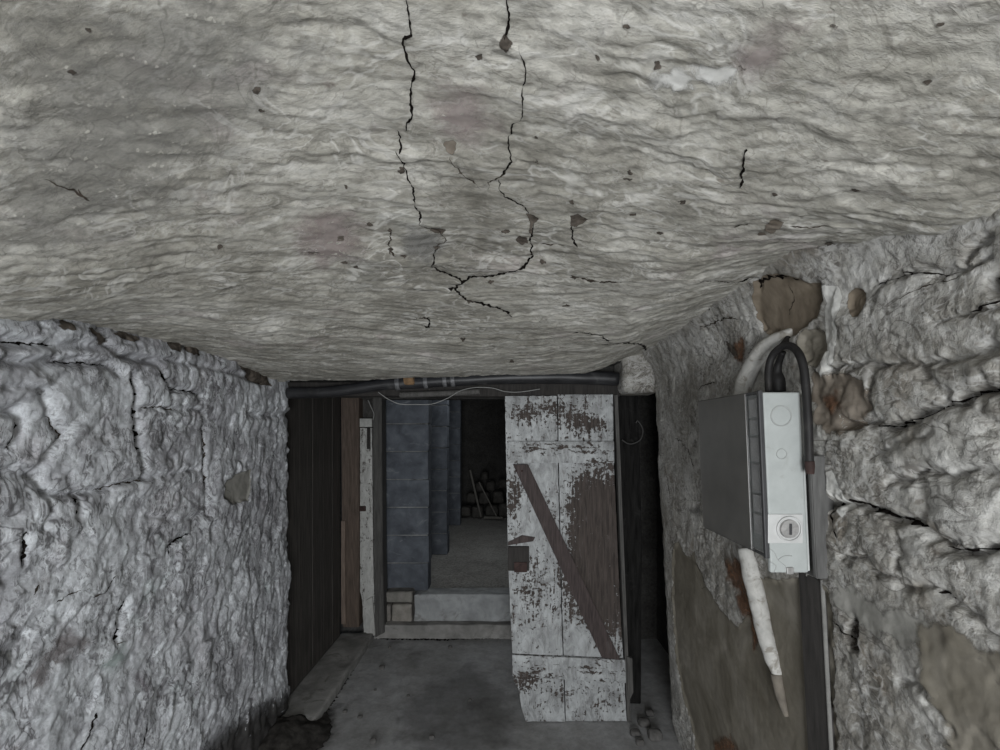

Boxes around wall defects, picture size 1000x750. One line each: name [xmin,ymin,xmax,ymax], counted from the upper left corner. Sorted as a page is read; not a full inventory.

crack [396,0,563,317]
crack [740,149,748,187]
crack [45,179,89,201]
crack [570,275,622,283]
crack [575,332,646,351]
flaking render [752,273,873,436]
crack [879,389,1000,428]
flaking render [224,469,251,505]
crack [830,499,1000,552]
crack [34,576,125,649]